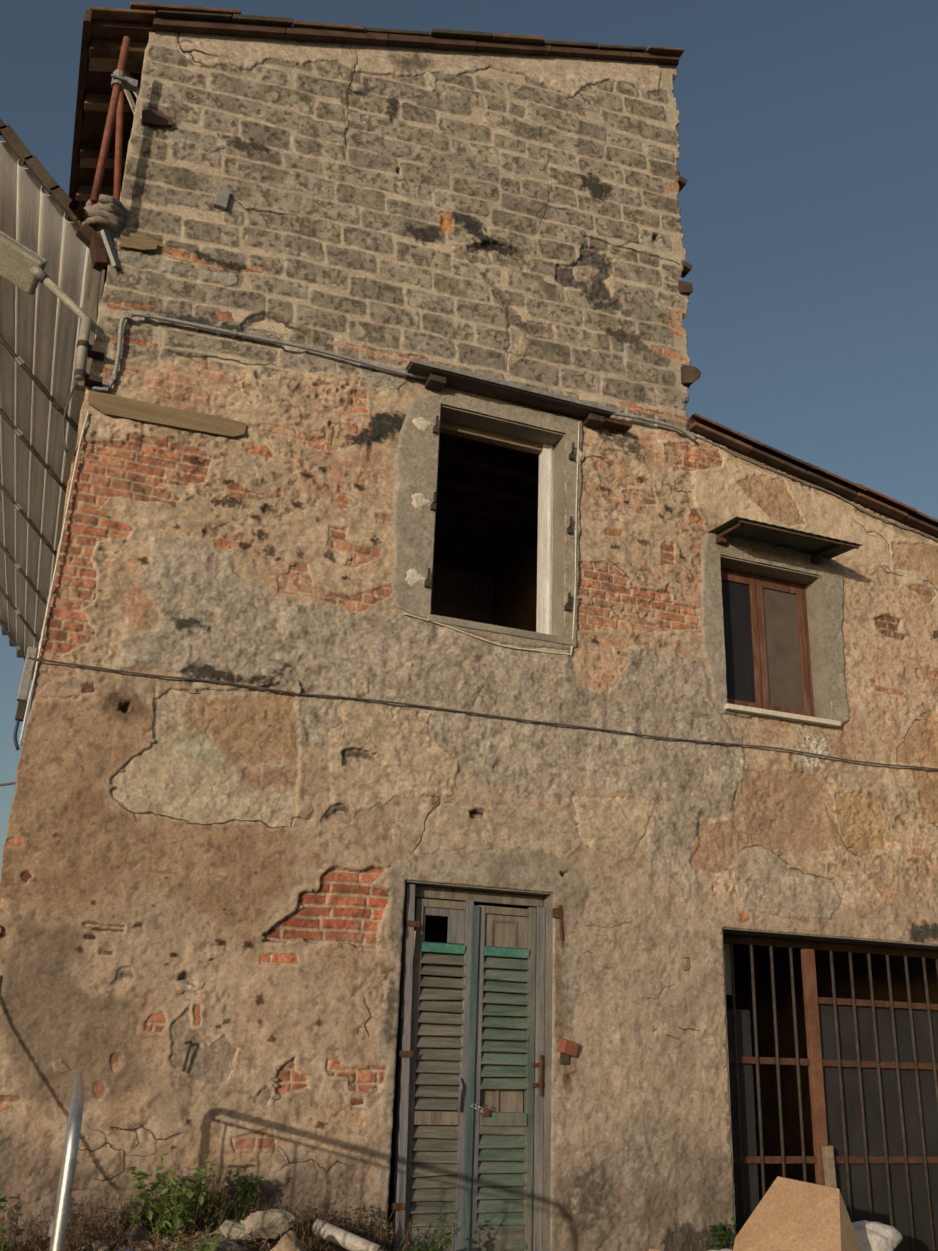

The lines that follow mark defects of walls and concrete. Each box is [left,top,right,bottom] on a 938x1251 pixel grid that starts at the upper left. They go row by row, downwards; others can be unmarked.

crack [344,51,359,158]
leakage [406,225,440,244]
leakage [452,211,515,259]
leakage [579,172,613,200]
leakage [347,411,406,454]
spalling [29,434,212,714]
spalling [202,479,392,615]
spalling [576,562,702,695]
flaking render [109,689,299,828]
spalling [243,862,389,964]
crack [73,1120,184,1190]
crack [279,1148,352,1183]